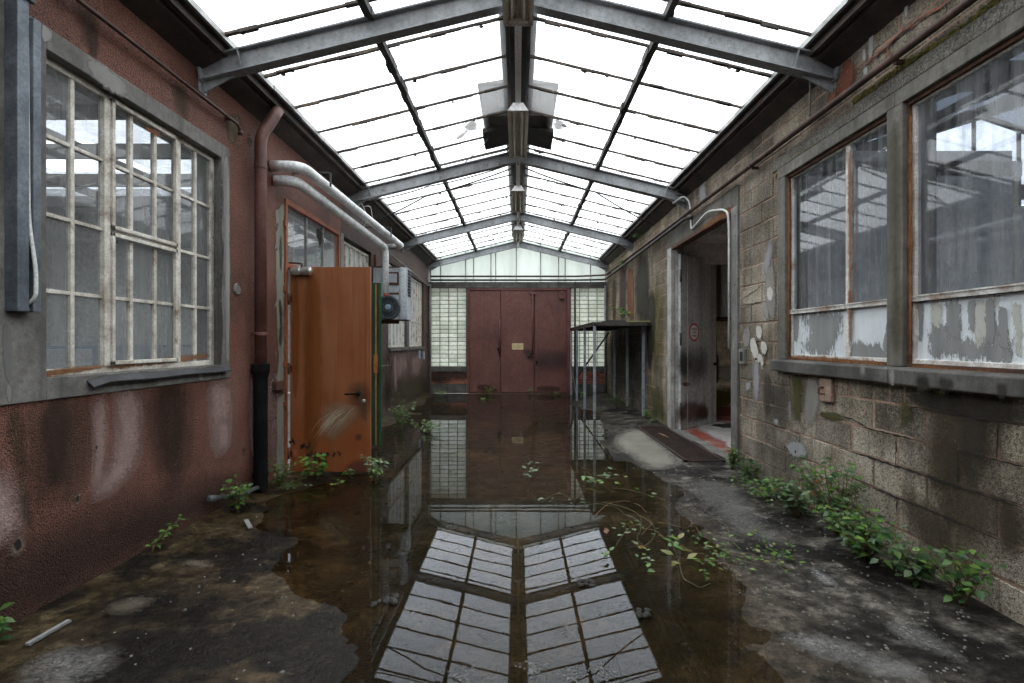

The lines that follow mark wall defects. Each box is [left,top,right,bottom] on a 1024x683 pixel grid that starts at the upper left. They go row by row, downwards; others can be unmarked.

leakage [862,35,873,76]
peeling [748,326,767,369]
peeling [794,299,887,358]
peeling [916,292,1024,364]
leakage [0,324,139,539]
leakage [210,383,231,449]
leakage [804,378,842,423]
leakage [908,377,1024,567]